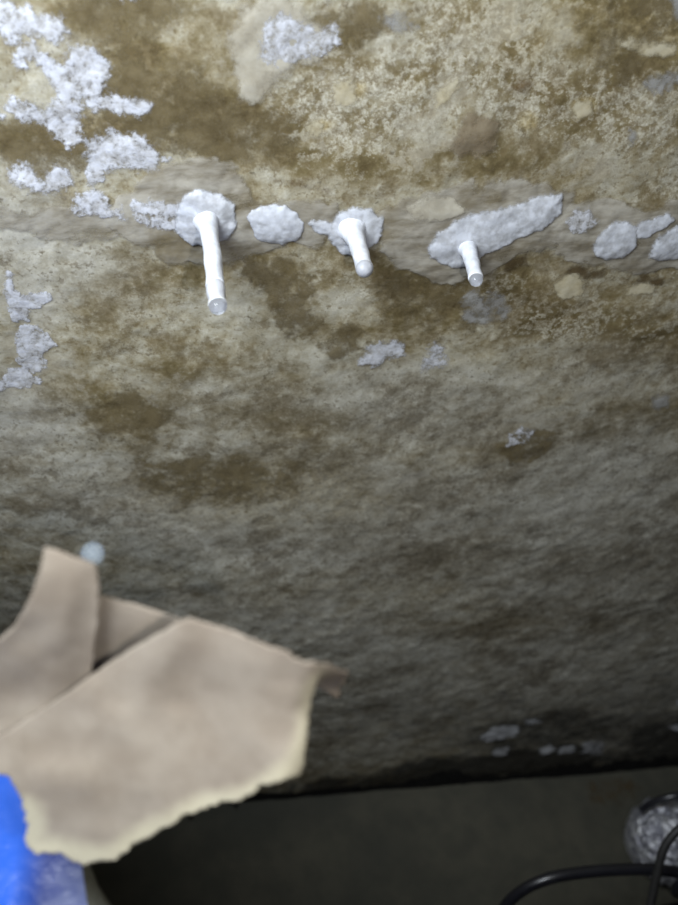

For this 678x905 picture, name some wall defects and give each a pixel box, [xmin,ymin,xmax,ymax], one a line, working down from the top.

damp [261,5,379,68]
damp [0,0,339,336]
damp [0,271,58,391]
damp [317,324,404,367]
damp [481,719,541,756]
damp [539,742,606,755]